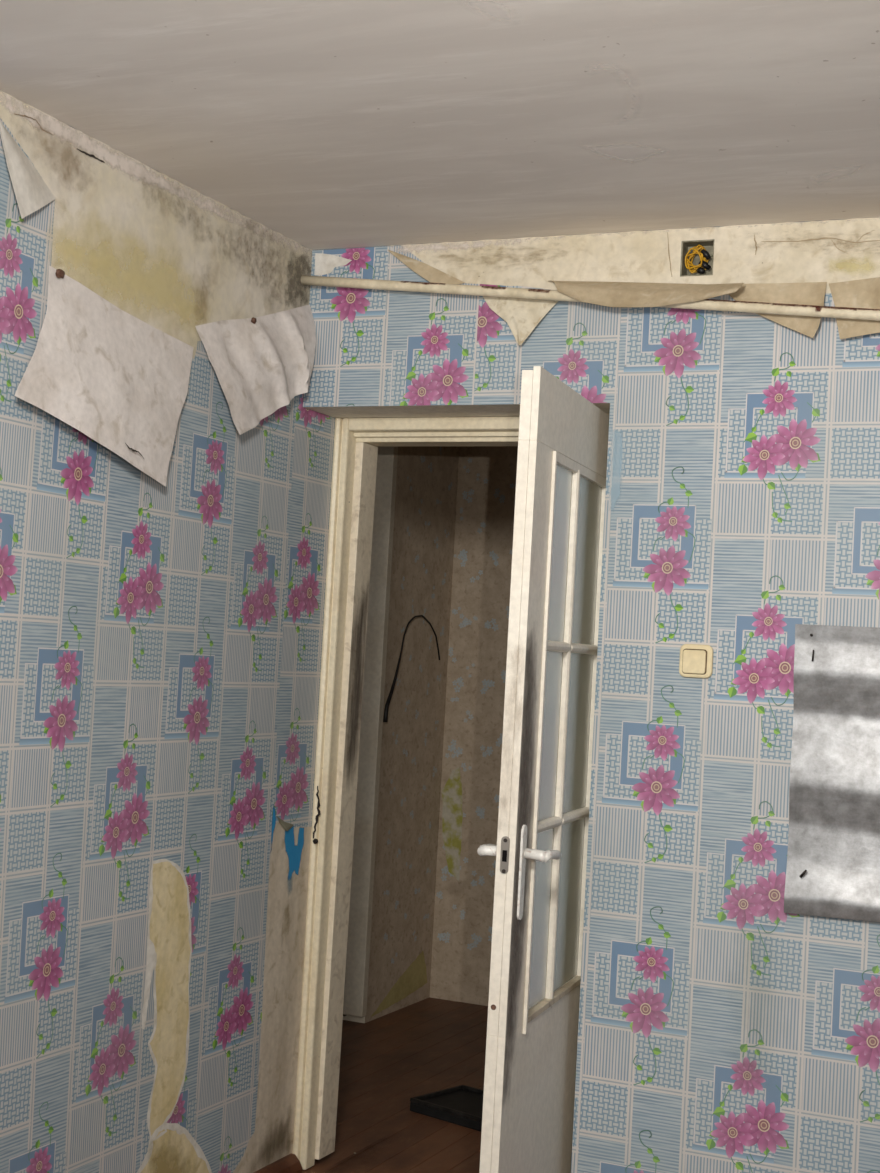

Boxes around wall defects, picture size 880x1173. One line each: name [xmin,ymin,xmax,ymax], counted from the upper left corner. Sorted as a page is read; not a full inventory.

flaking render [0,91,312,359]
mould [234,239,312,304]
flaking render [389,217,880,295]
peeling [142,937,156,1030]
flaking render [233,822,312,1173]